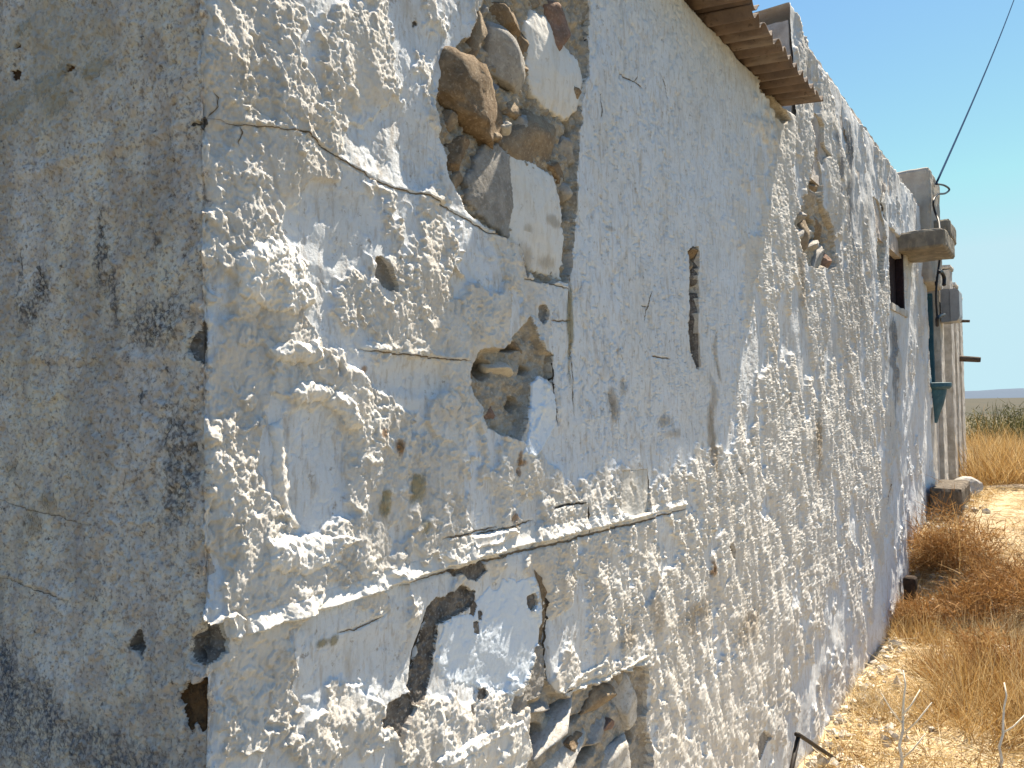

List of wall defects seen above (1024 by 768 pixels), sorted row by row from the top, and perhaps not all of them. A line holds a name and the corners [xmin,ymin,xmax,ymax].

crack [207,93,499,235]
spalling [436,0,589,284]
spalling [794,183,836,270]
crack [361,349,467,361]
spalling [470,305,557,458]
spalling [688,246,699,369]
spalling [181,610,247,734]
crack [339,617,381,633]
peeling [381,560,486,738]
crack [399,475,685,678]
spalling [436,640,652,768]